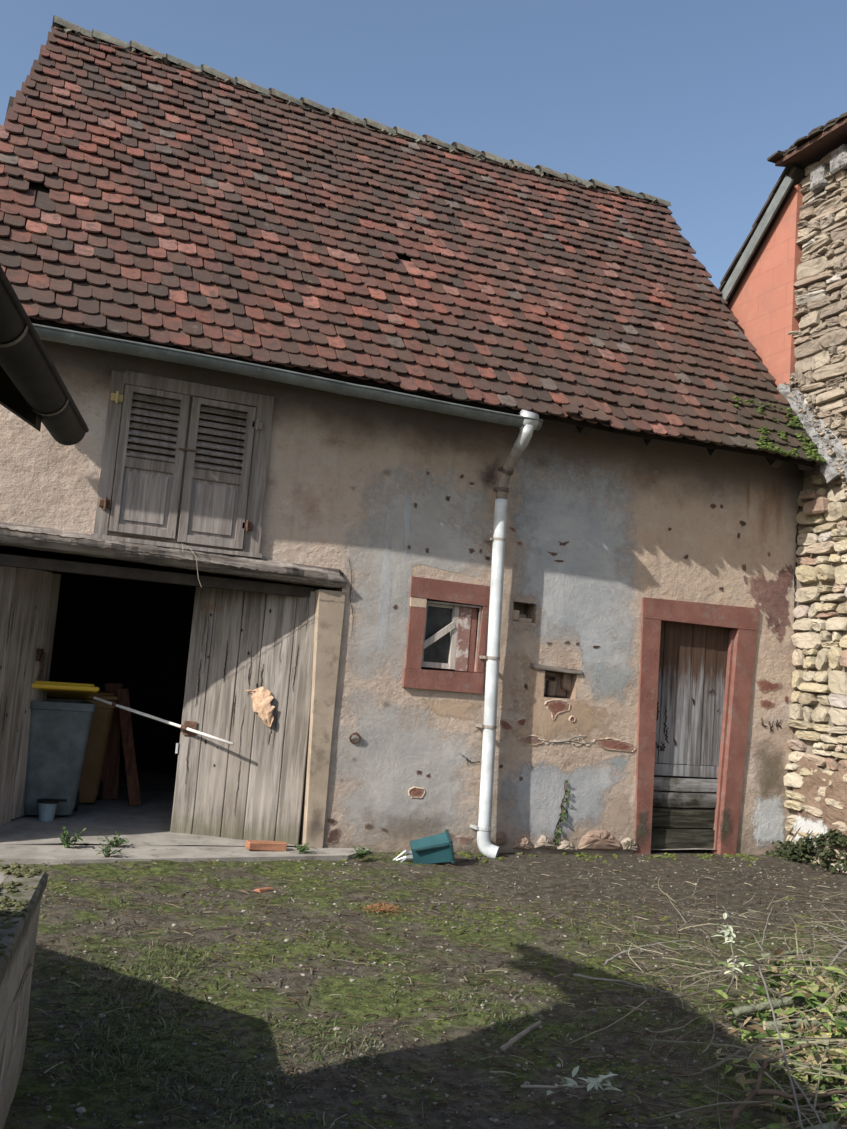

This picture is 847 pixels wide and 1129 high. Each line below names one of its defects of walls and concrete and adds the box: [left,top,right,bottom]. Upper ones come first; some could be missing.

flaking render [742,564,793,643]
peeling [496,459,638,852]
flaking render [757,679,788,709]